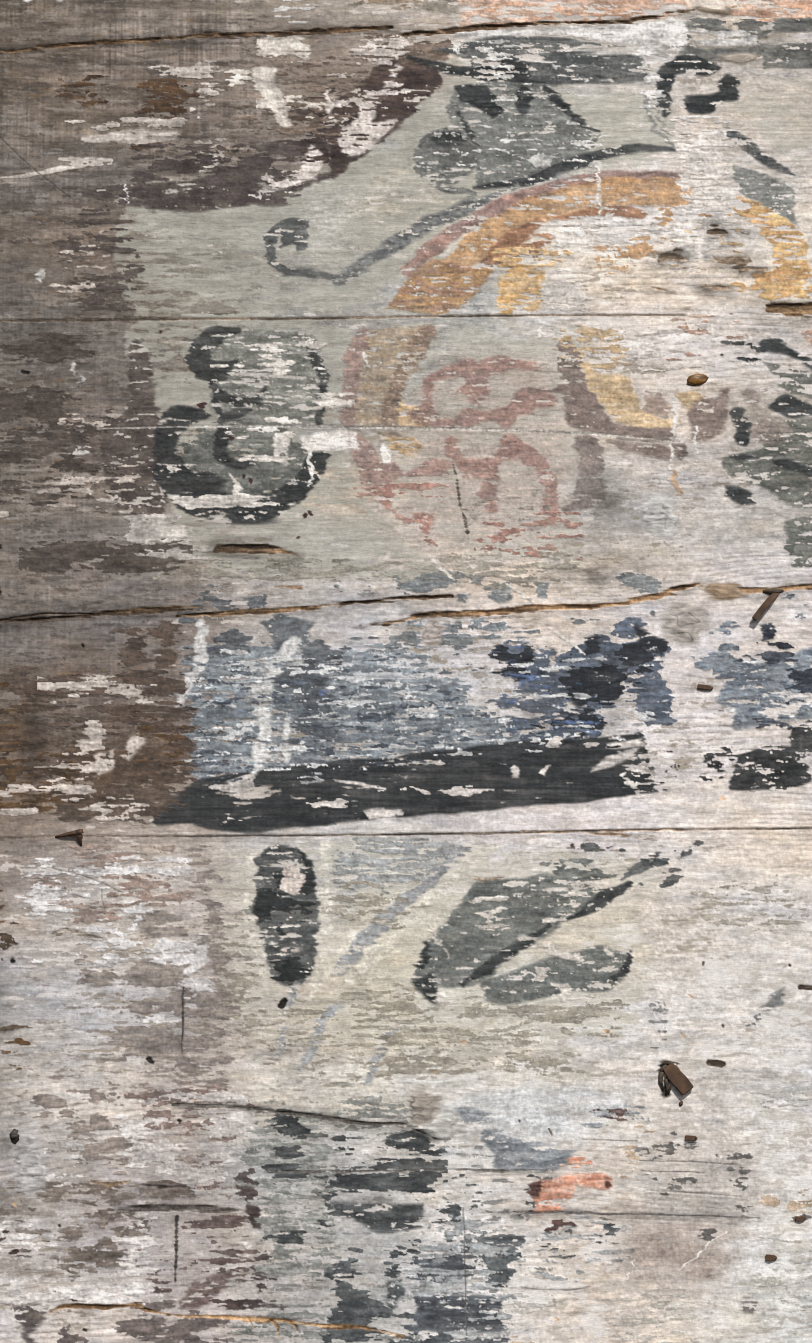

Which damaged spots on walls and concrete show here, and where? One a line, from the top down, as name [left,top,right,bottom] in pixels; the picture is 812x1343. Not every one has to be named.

rust [0,875,19,951]
rust [5,1025,33,1071]